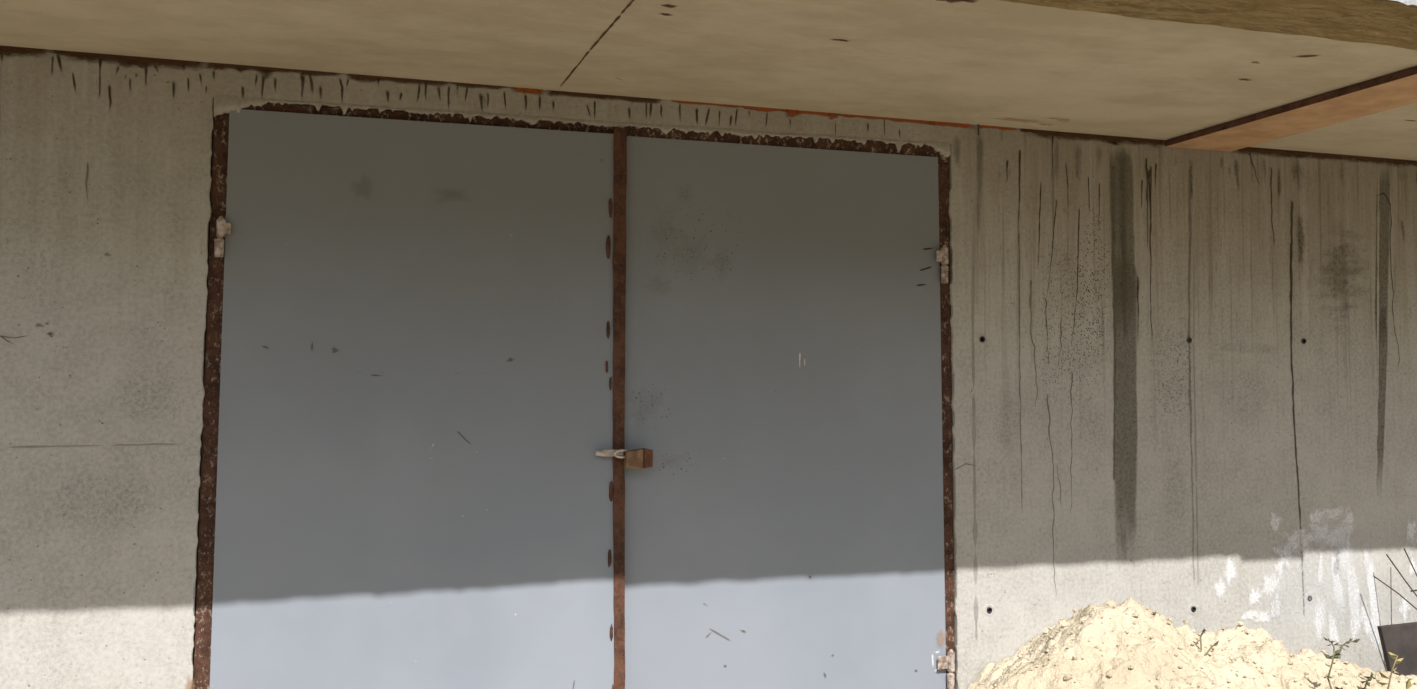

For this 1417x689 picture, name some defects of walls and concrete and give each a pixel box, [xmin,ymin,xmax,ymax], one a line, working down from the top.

leakage [99,60,158,106]
leakage [301,74,322,96]
rust [0,0,1165,146]
leakage [1006,151,1021,231]
leakage [1038,156,1190,539]
crack [1250,154,1305,613]
leakage [1215,556,1236,599]
leakage [1241,506,1379,648]
leakage [1399,598,1410,622]
leakage [1406,521,1417,575]